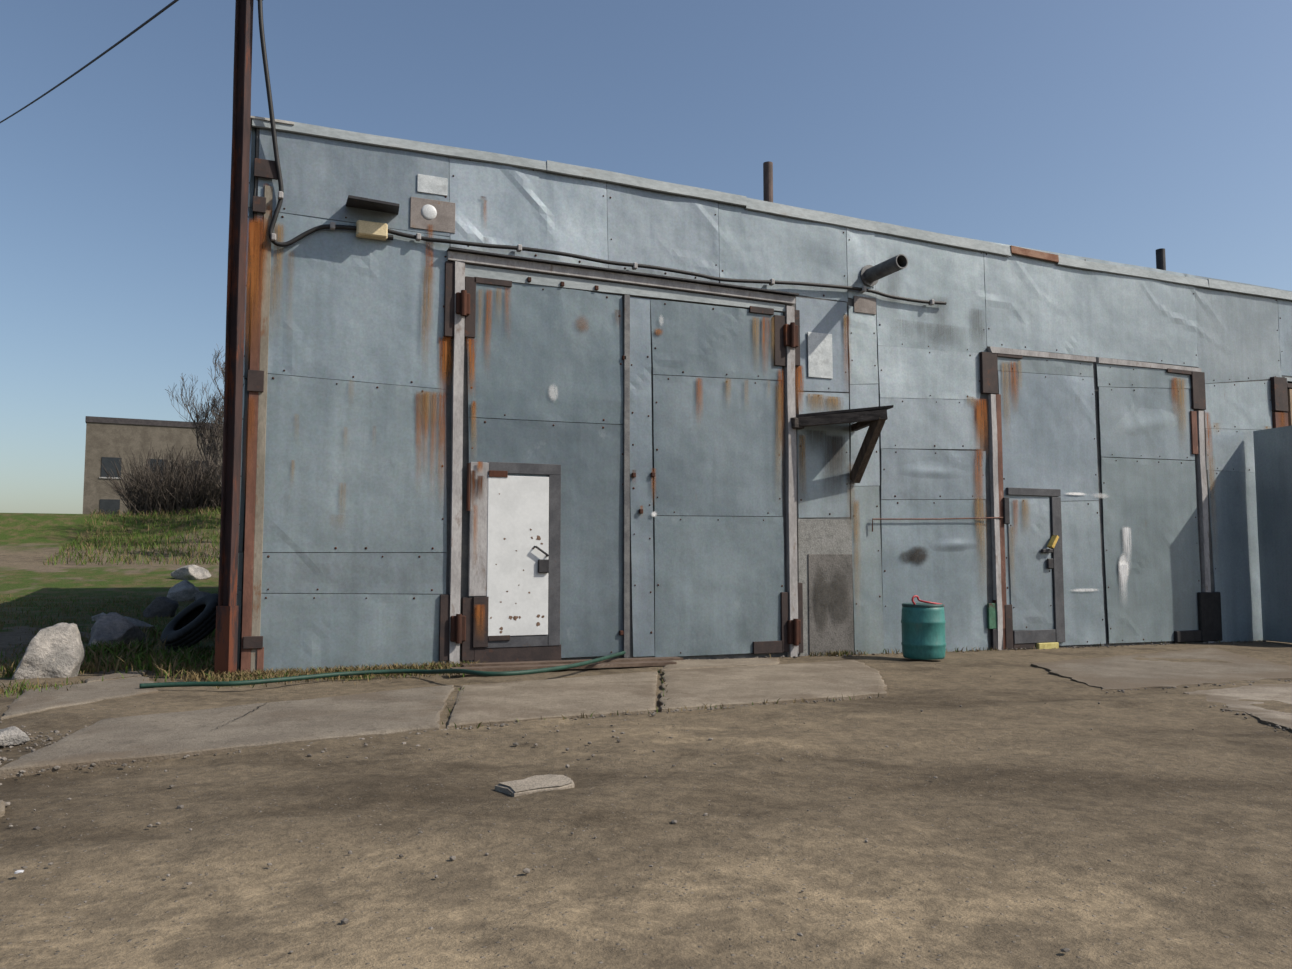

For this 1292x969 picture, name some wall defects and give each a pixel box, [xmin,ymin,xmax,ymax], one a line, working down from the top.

corrosion [247,218,283,314]
corrosion [440,337,452,377]
corrosion [468,289,507,380]
corrosion [470,461,483,534]
corrosion [972,397,987,546]
leakage [815,577,848,629]